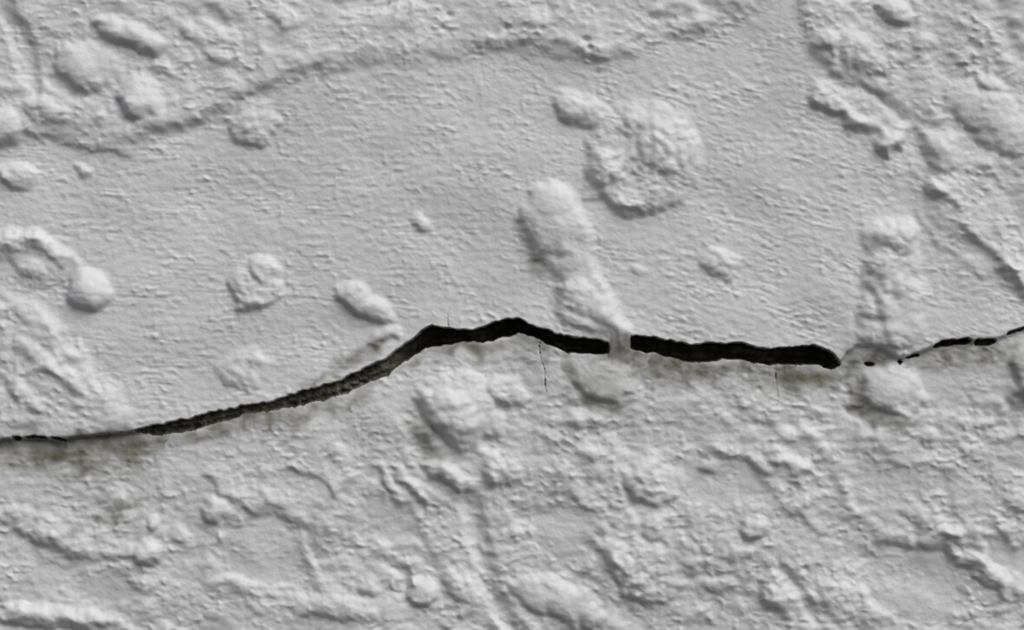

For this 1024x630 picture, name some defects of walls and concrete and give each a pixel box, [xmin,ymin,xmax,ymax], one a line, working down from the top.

crack [120,308,1024,437]
crack [14,434,67,442]